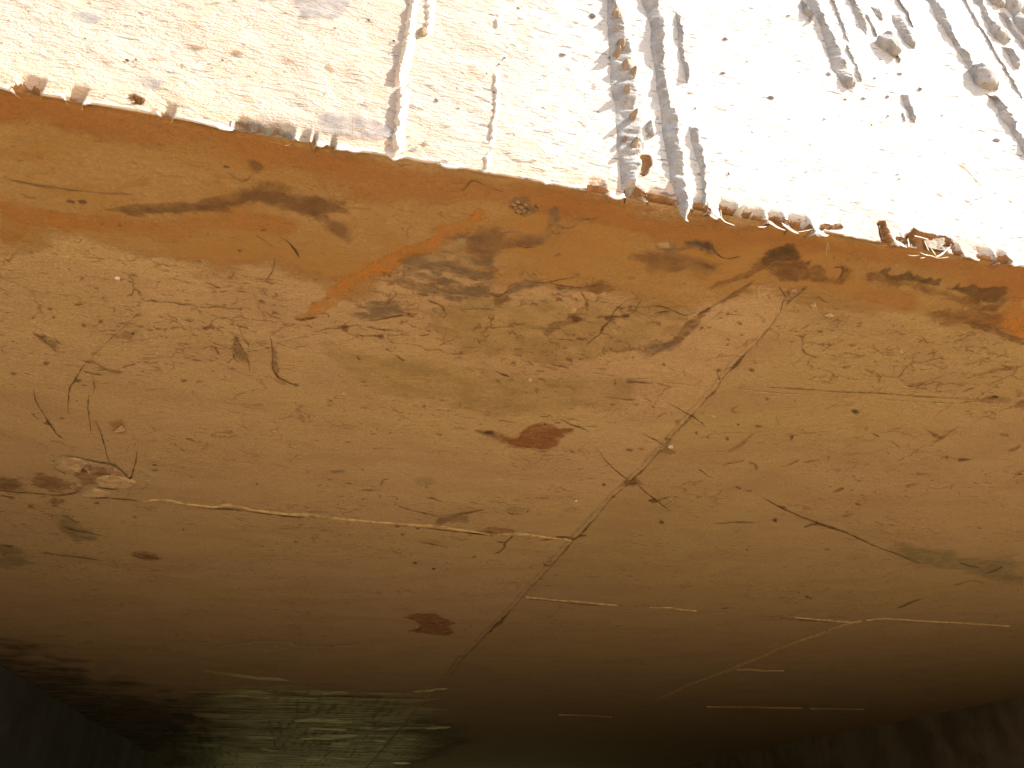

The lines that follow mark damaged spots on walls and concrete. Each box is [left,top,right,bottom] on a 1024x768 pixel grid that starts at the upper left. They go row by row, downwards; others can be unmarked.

spalling [129,94,172,119]
spalling [230,119,292,142]
spalling [640,154,652,176]
water stain [0,89,440,301]
spalling [624,187,678,206]
spalling [692,202,849,236]
water stain [461,183,1024,349]
spalling [877,220,1024,266]
crack [316,265,695,377]
rust [500,414,572,448]
crack [456,354,745,669]
crack [736,487,921,567]